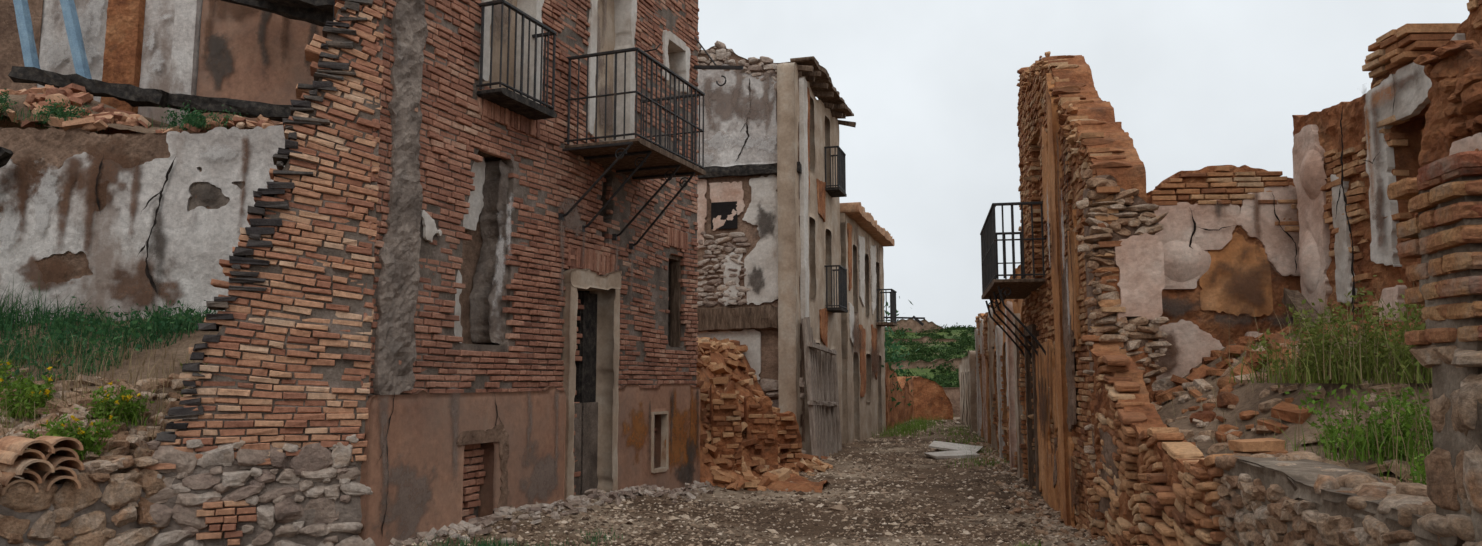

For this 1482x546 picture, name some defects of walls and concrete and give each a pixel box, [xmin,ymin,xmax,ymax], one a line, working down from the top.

crack [735,78,751,162]
peeling [0,127,170,172]
crack [139,157,176,294]
spalling [189,167,245,211]
peeling [709,181,745,231]
peeling [39,251,93,282]
peeling [722,252,743,305]
flaking render [1154,185,1300,380]